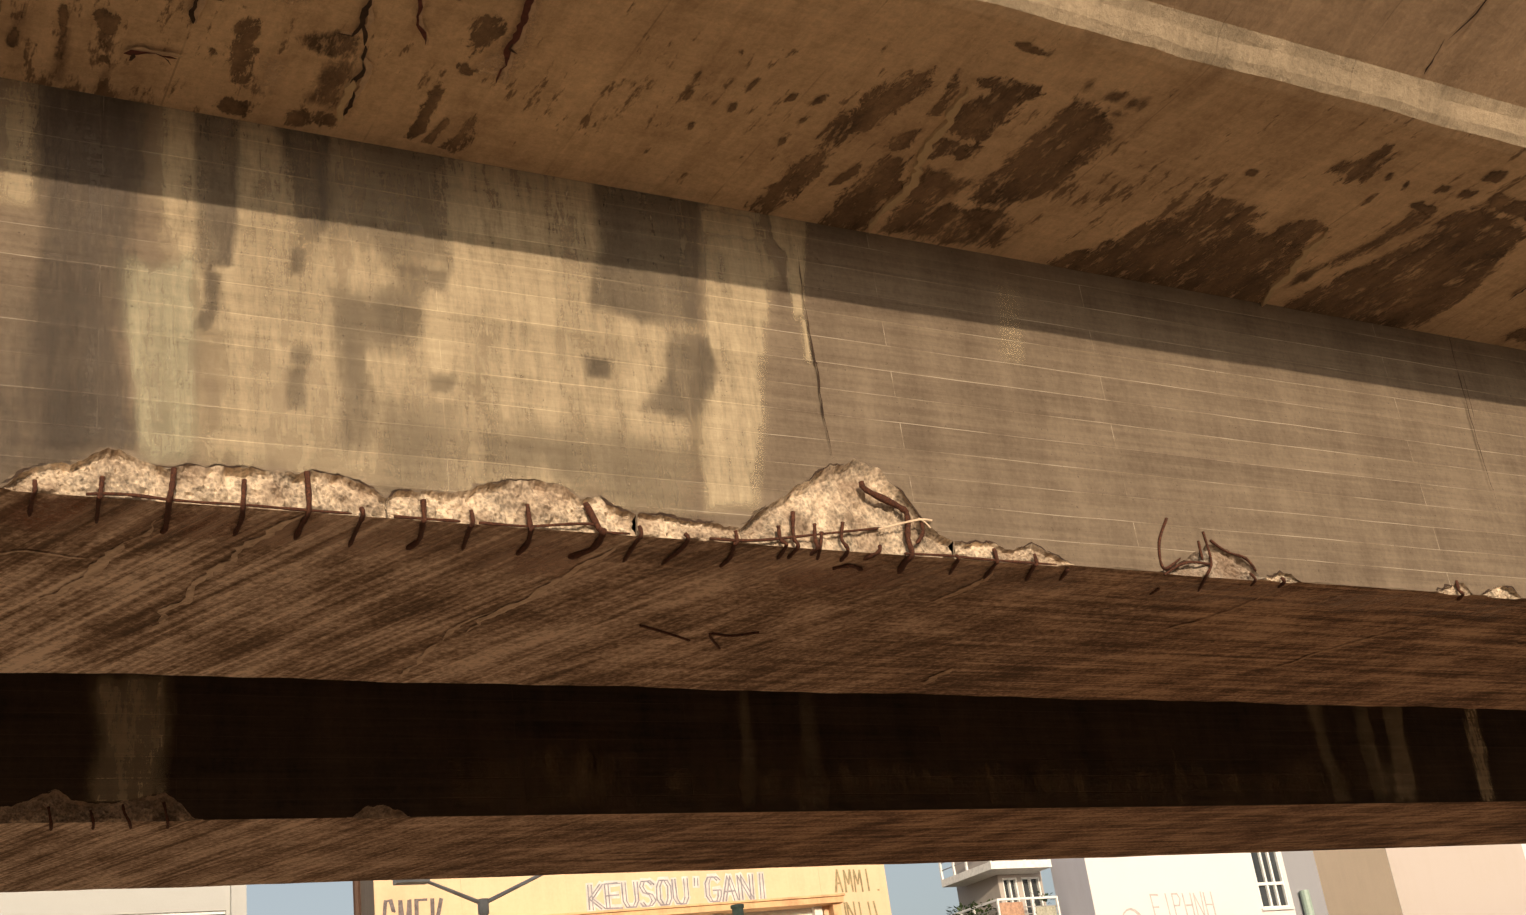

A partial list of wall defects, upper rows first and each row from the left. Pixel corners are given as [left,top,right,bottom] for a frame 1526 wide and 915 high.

crack [124,0,207,65]
crack [338,0,375,119]
crack [416,0,429,45]
crack [496,0,537,84]
crack [1424,0,1487,74]
water stain [4,80,811,508]
spalling [1,448,1074,582]
spalling [1149,517,1301,595]